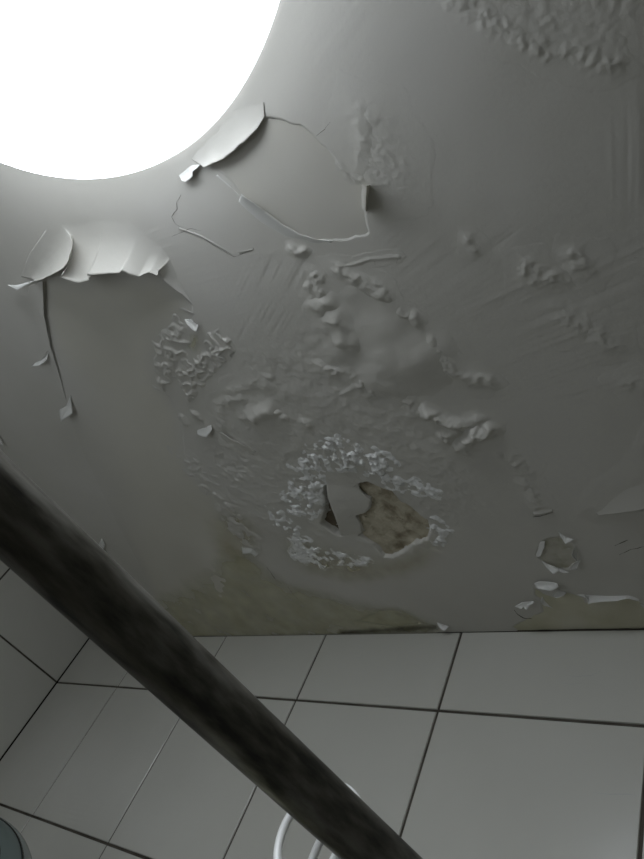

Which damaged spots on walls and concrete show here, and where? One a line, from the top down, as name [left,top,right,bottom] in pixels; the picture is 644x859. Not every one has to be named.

crack [172,195,254,257]
peeling [179,102,370,243]
peeling [9,218,449,636]
leakage [264,433,443,571]
leakage [167,559,428,636]
peeling [514,531,644,630]